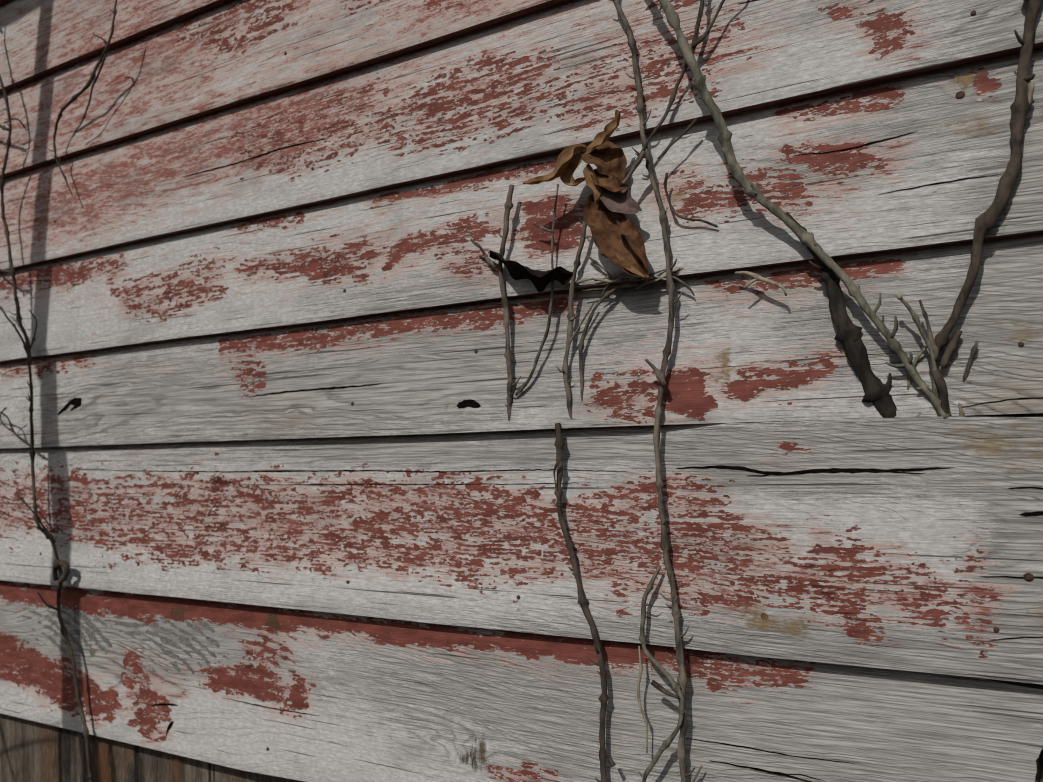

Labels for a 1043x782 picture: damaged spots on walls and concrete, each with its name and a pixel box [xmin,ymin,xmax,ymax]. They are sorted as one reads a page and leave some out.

peeling [172,0,298,61]
peeling [817,1,915,60]
peeling [229,9,758,188]
peeling [773,86,906,121]
peeling [370,160,557,208]
peeling [668,142,891,228]
peeling [0,194,584,325]
peeling [218,297,576,402]
crack [677,465,955,476]
peeling [0,452,1008,742]
peeling [486,761,563,782]
crack [685,738,854,782]